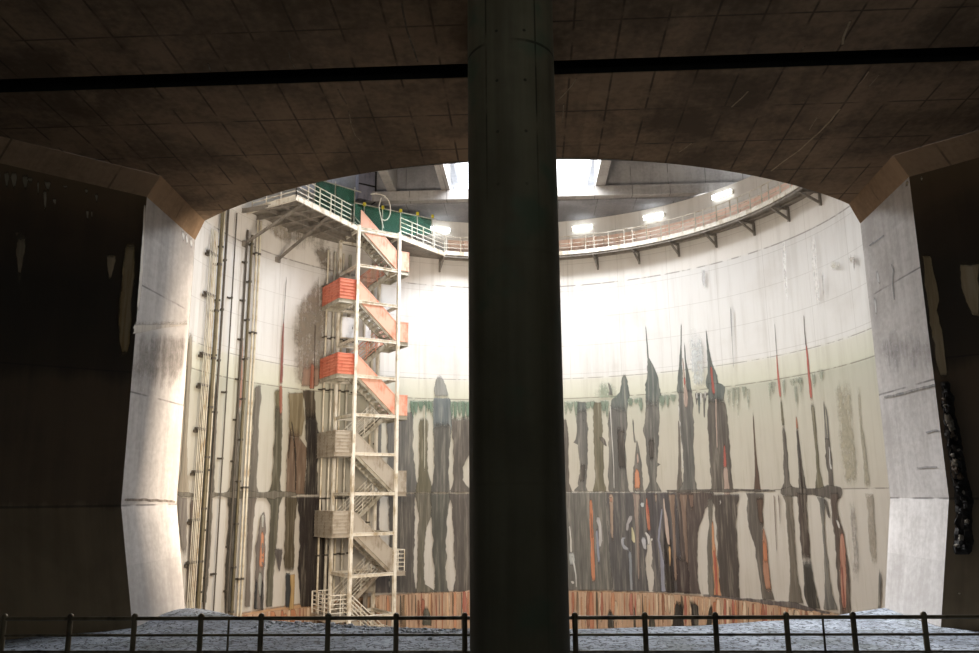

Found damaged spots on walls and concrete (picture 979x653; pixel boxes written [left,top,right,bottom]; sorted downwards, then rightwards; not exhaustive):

water stain [107,205,330,611]
water stain [375,377,470,593]
water stain [564,325,876,614]
spalling [923,255,974,555]
peeling [960,264,979,315]